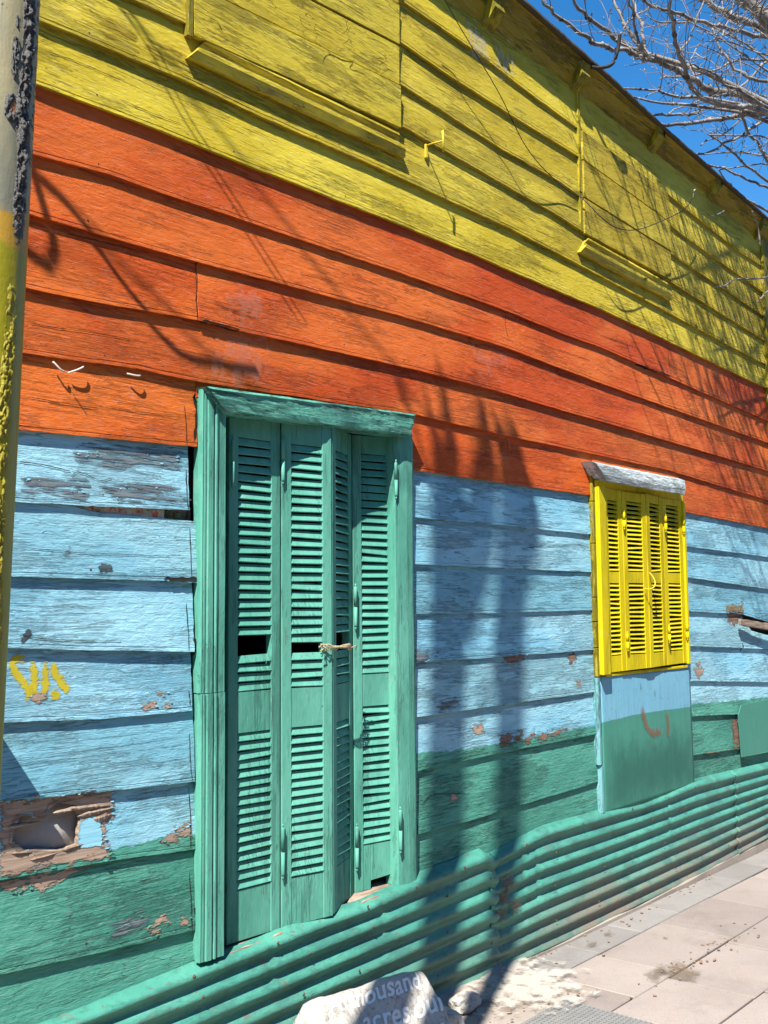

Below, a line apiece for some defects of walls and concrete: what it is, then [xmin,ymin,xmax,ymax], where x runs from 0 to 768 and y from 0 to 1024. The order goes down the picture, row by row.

peeling [20,442,191,521]
peeling [726,601,744,628]
peeling [140,691,172,711]
peeling [498,725,568,748]
peeling [0,790,116,895]
peeling [159,821,193,845]
peeling [110,909,192,940]